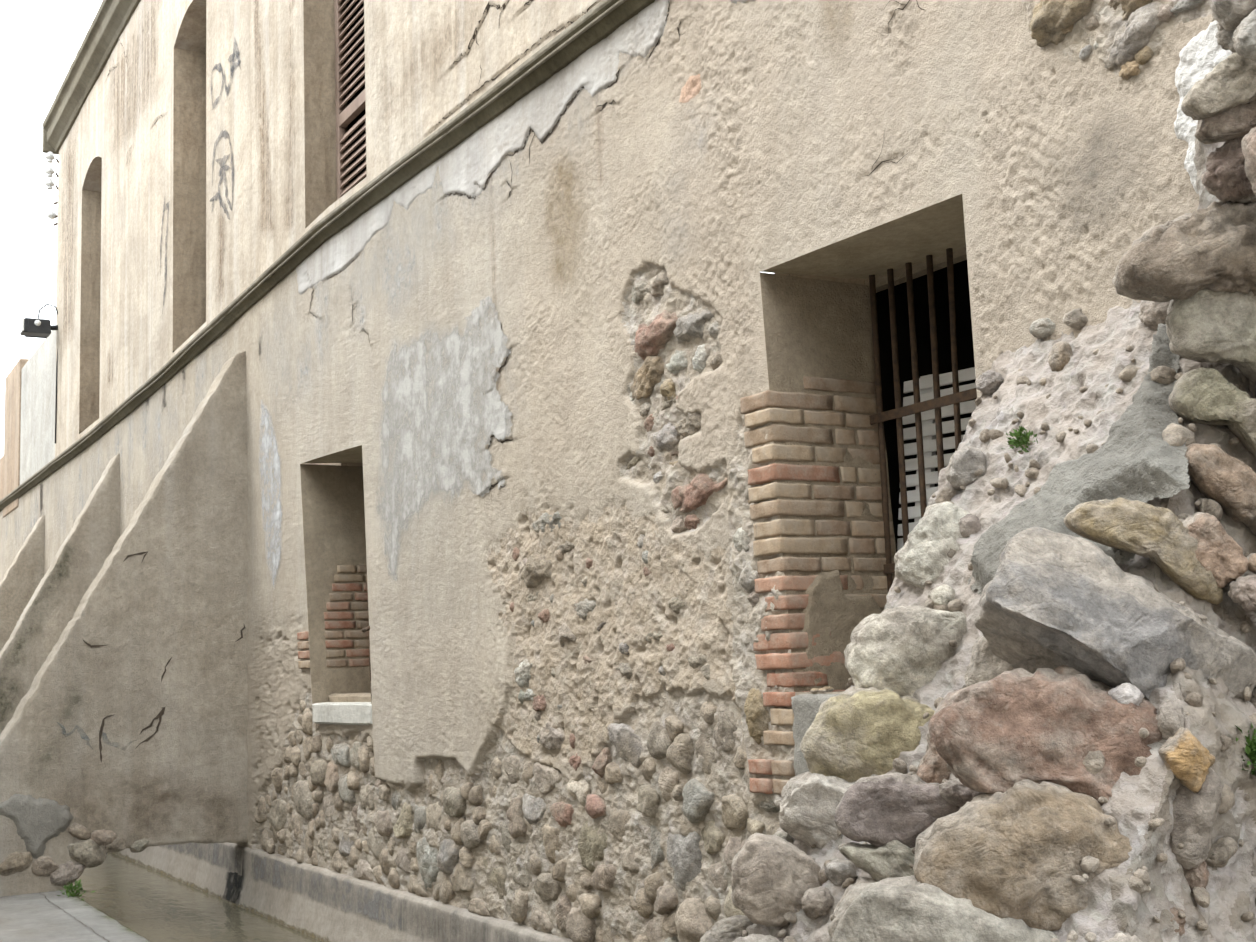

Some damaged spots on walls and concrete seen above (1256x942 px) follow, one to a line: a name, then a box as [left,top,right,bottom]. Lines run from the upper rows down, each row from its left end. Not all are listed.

crack [429,0,596,133]
peeling [296,0,670,295]
crack [123,552,148,562]
spalling [252,263,796,942]
crack [99,714,115,762]
crack [135,657,172,749]